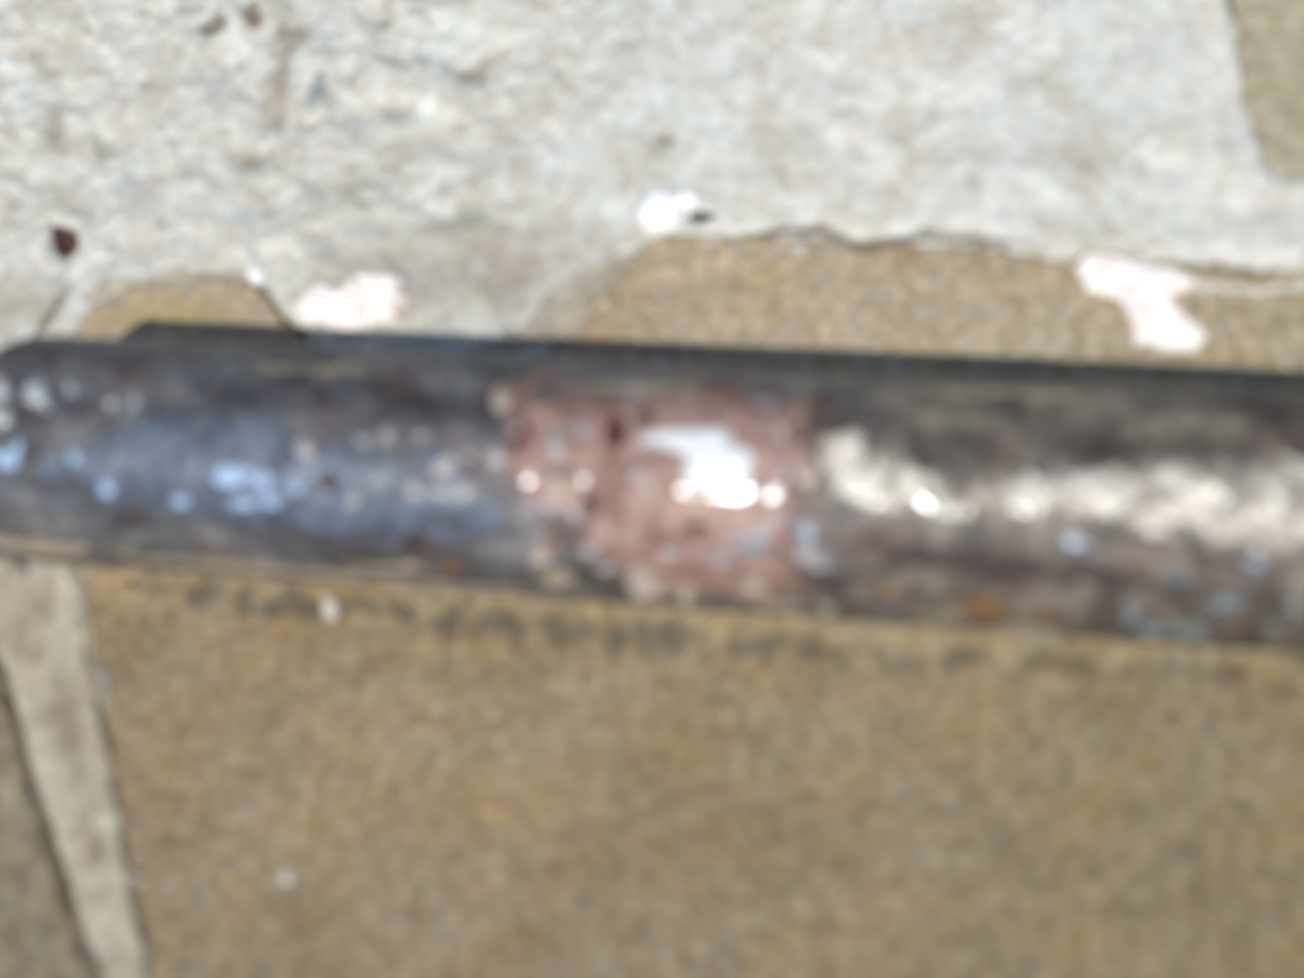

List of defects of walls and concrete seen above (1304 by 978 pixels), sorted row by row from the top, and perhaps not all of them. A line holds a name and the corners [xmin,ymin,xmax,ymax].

peeling [249,268,264,285]
rust [500,373,814,603]
peeling [322,597,339,620]